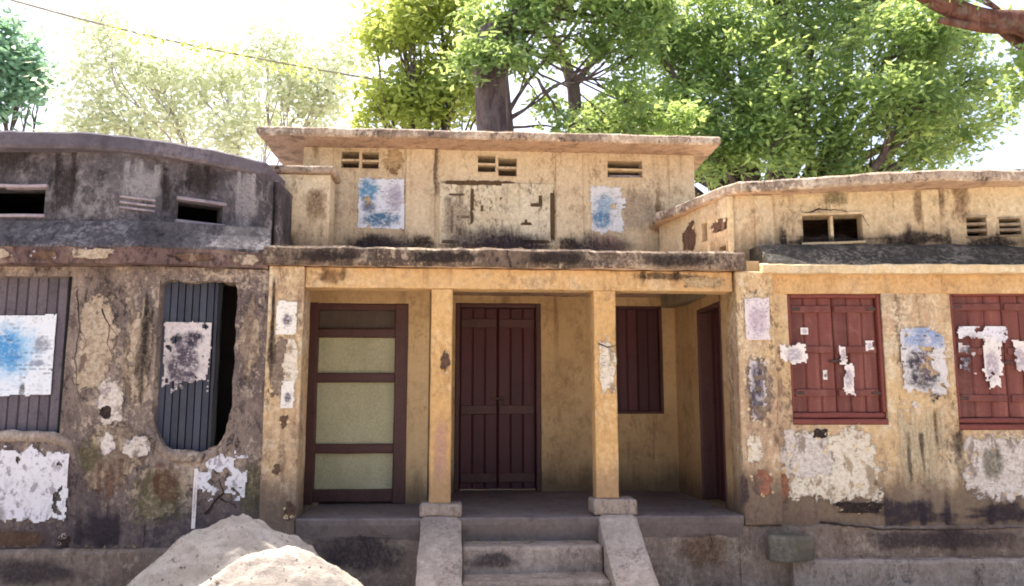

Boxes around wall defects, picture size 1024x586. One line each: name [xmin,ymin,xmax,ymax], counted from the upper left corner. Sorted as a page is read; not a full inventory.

water stain [54,152,78,208]
water stain [124,160,170,209]
water stain [235,171,256,227]
water stain [296,198,630,283]
spalling [682,219,696,251]
spalling [440,350,450,374]
flaking render [73,293,192,519]
peeling [743,355,890,514]
water stain [897,409,963,483]
peeling [960,433,1024,504]
water stain [875,500,1024,550]